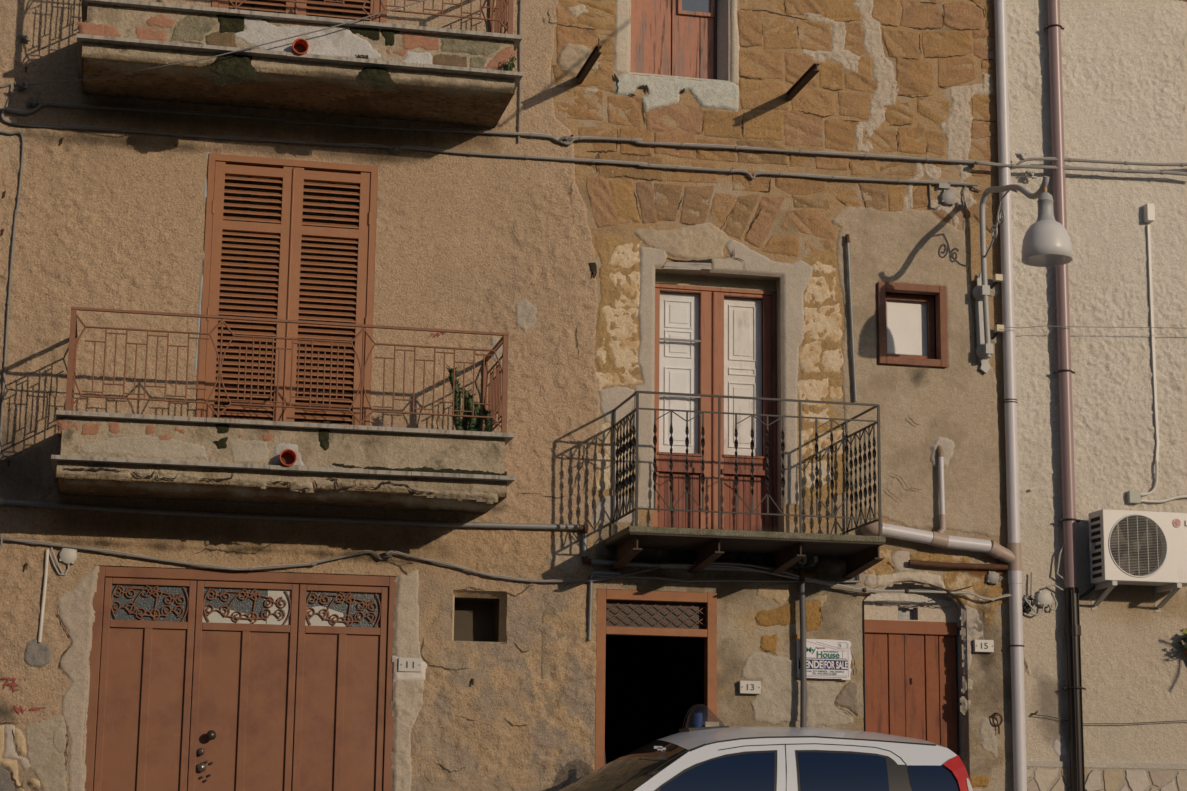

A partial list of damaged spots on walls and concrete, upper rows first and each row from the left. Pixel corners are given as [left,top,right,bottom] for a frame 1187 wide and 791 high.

flaking render [76,21,121,37]
flaking render [135,14,175,41]
flaking render [386,32,467,67]
damp [297,74,509,94]
flaking render [552,0,1000,505]
peeling [990,330,1003,345]
flaking render [863,549,896,576]
flaking render [870,553,1008,625]
flaking render [754,583,827,656]
peeling [57,565,100,791]
flaking render [0,722,40,791]